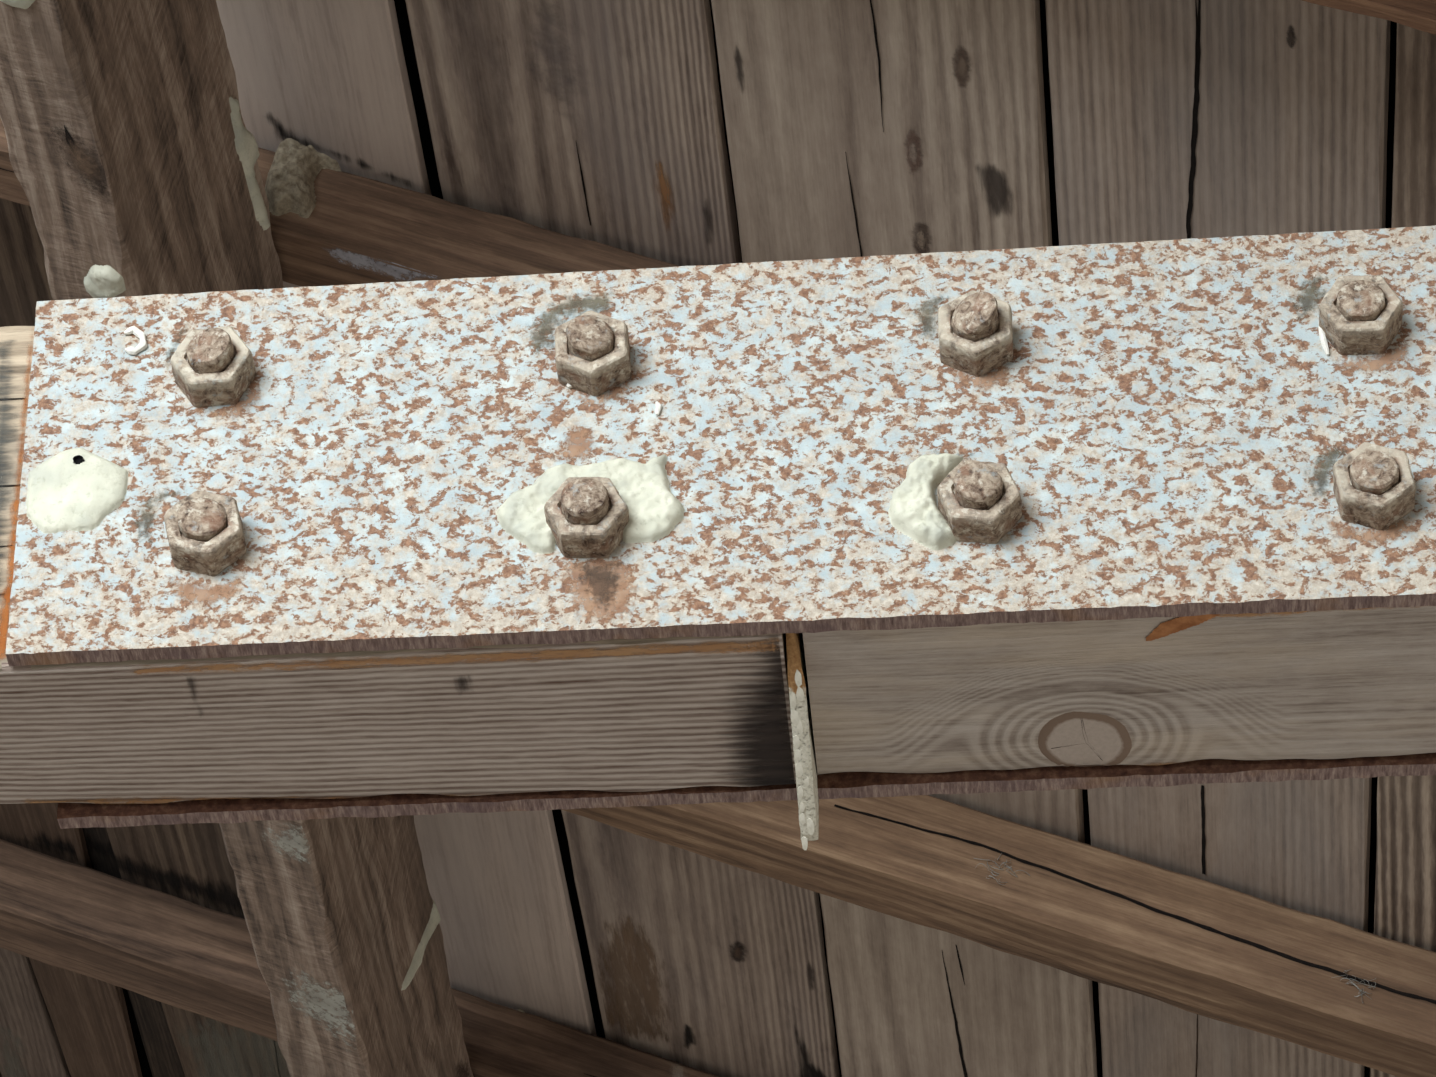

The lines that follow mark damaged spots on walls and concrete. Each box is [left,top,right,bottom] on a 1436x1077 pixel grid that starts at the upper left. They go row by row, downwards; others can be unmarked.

crack [870,0,884,132]
crack [1186,0,1201,239]
crack [846,157,862,257]
corrosion [1339,344,1413,371]
corrosion [0,375,29,658]
corrosion [168,577,242,604]
corrosion [562,558,637,620]
corrosion [1328,520,1413,544]
crack [834,804,1436,1004]
damp [601,918,668,1041]
damp [685,1025,694,1048]
crack [942,945,968,1077]